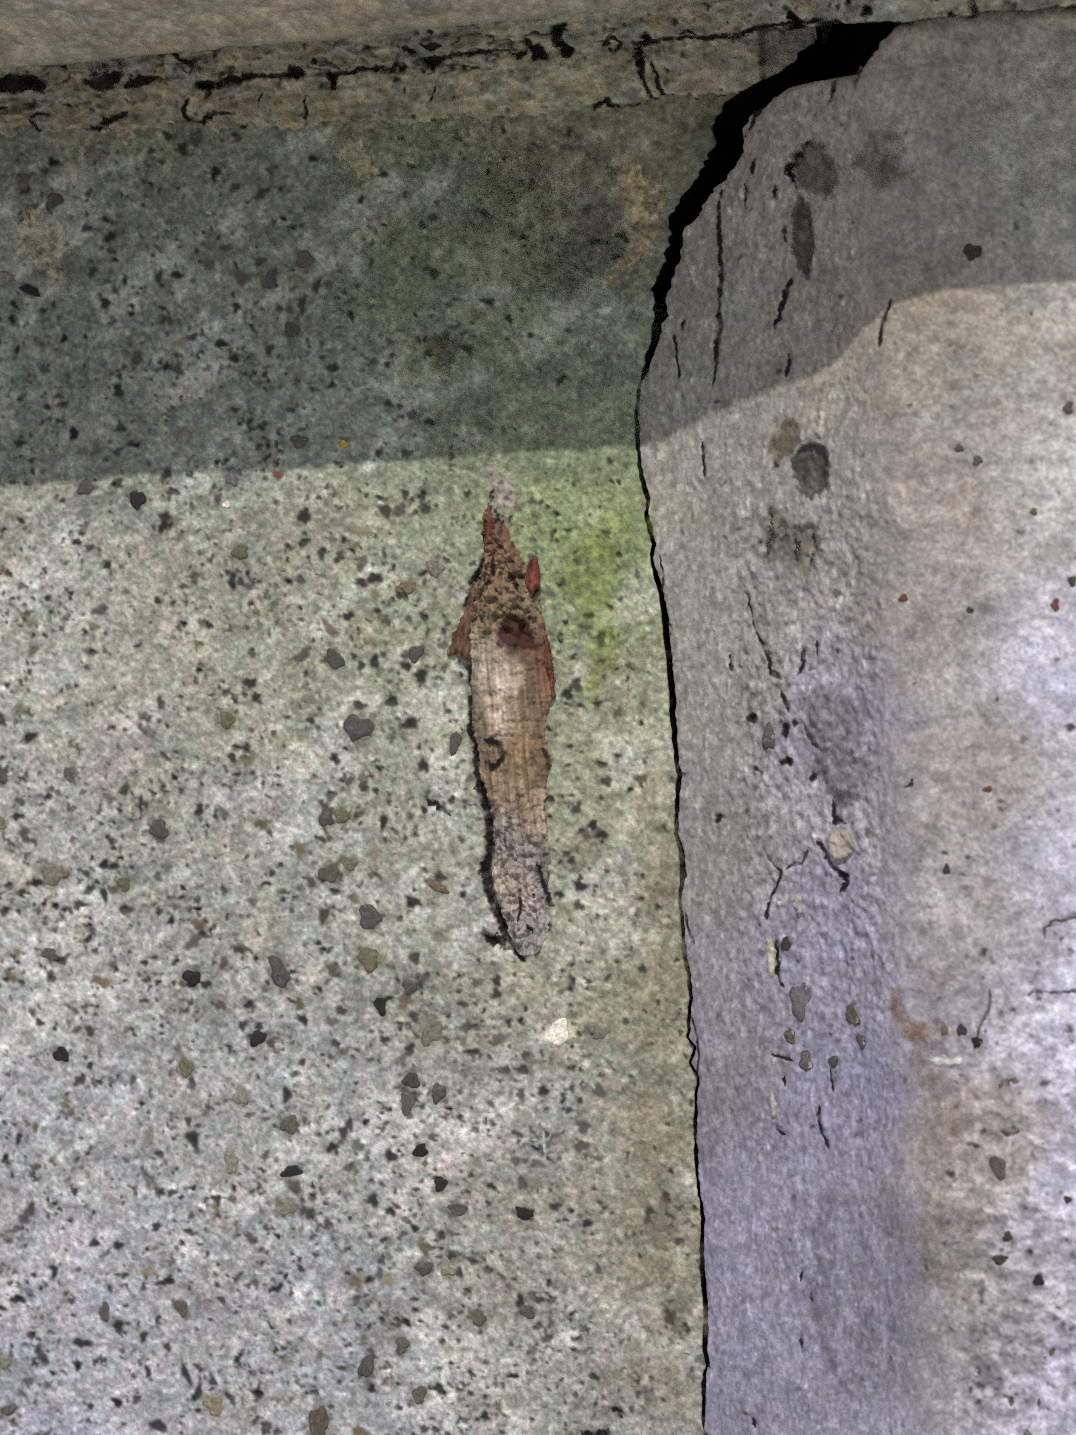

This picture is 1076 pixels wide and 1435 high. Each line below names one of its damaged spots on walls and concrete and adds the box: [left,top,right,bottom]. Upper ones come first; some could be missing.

crack [86,10,912,1435]
damp [486,462,517,507]